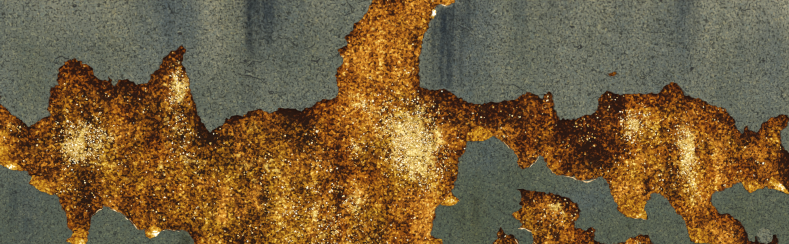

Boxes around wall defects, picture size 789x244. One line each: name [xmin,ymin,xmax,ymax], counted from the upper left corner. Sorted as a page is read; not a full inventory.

rust [677,137,696,166]
rust [493,189,653,244]
peeling [756,227,773,244]